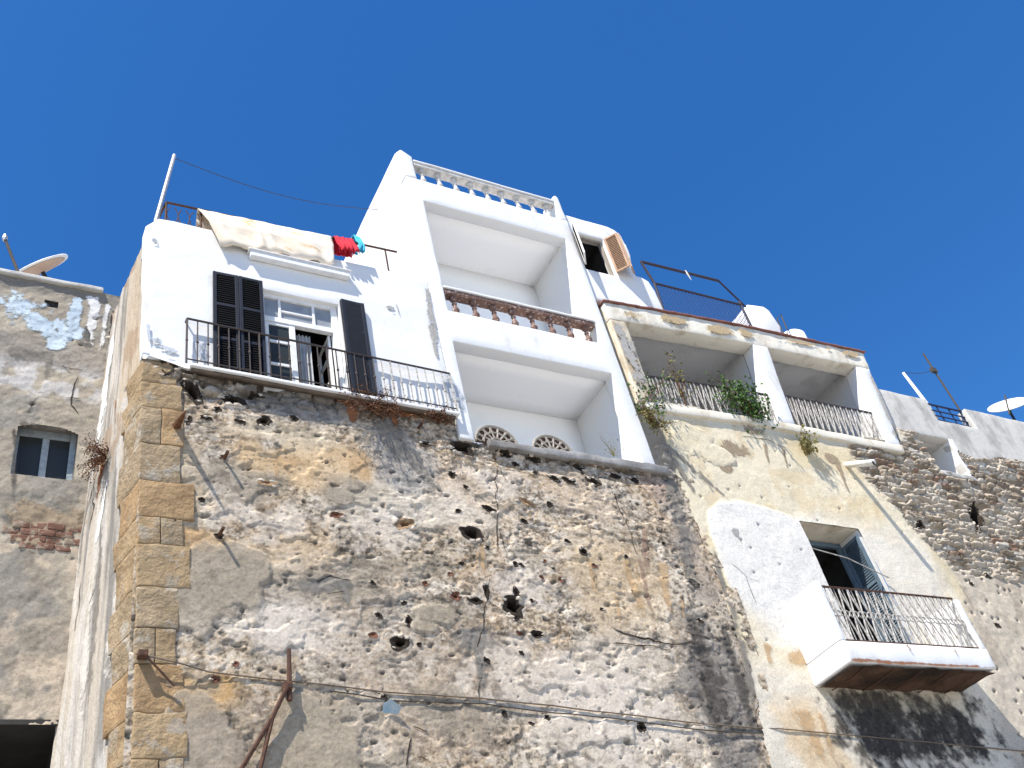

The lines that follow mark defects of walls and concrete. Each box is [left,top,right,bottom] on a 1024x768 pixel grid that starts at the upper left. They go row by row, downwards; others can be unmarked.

crack [28,363,81,415]
peeling [0,290,114,442]
spalling [2,498,85,552]
peeling [95,479,108,543]
crack [494,469,506,549]
spalling [961,494,985,533]
crack [477,579,499,700]